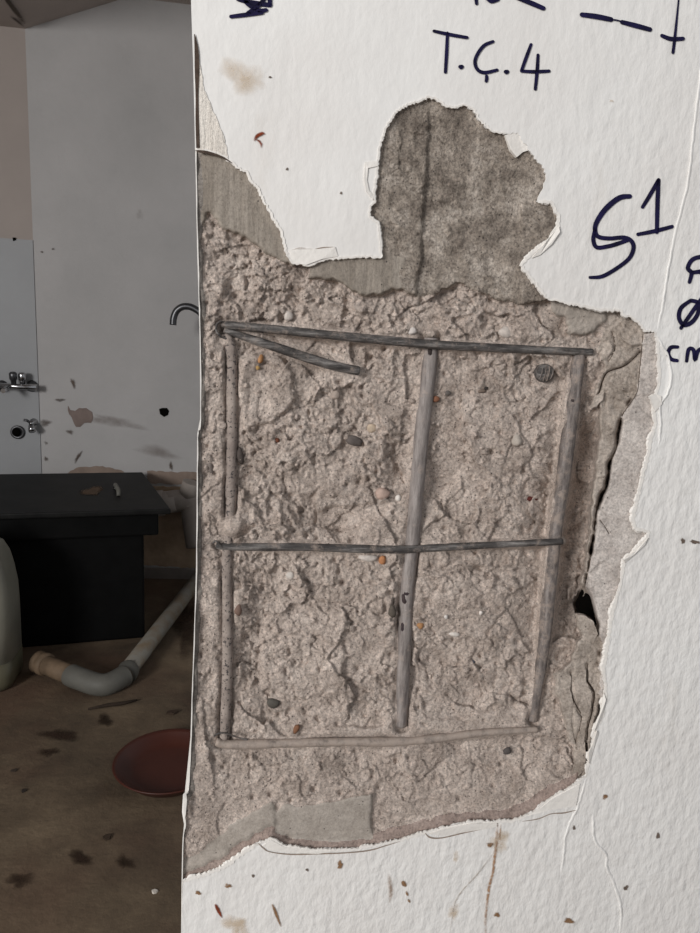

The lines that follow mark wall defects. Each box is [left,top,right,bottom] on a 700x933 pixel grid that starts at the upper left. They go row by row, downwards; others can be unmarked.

spalling [144,63,662,883]
crack [585,71,700,584]
crack [425,829,501,918]
crack [522,778,623,933]